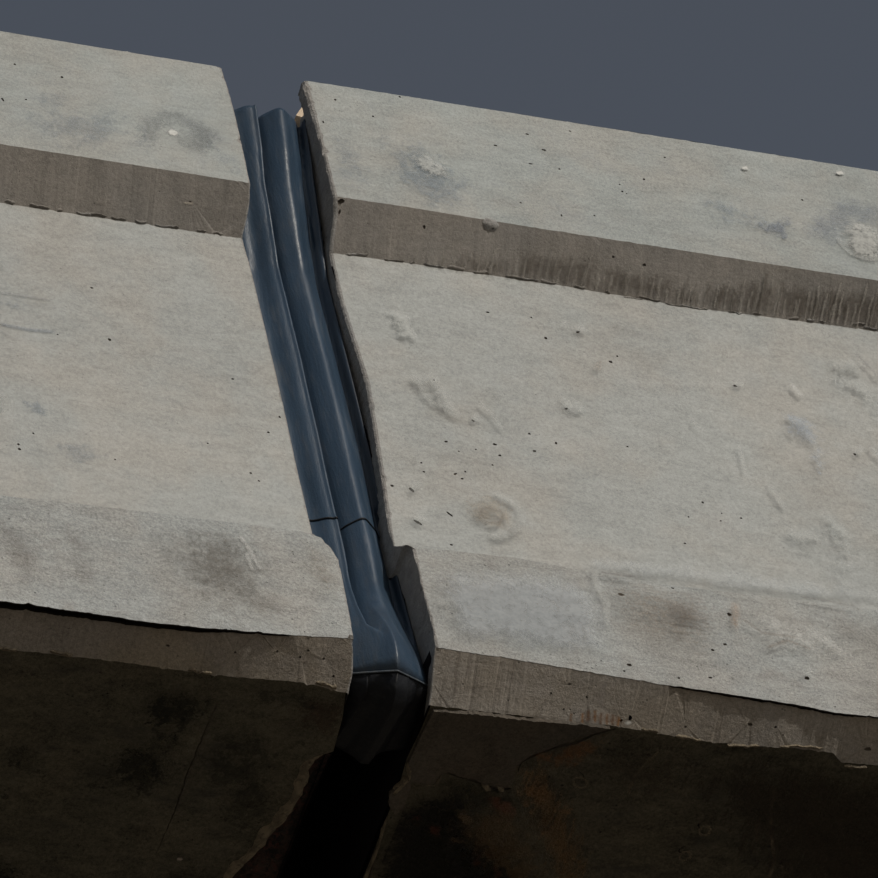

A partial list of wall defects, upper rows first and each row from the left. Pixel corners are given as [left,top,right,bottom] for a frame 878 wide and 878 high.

spalling [223,753,331,878]
peeling [365,708,632,878]
crack [447,729,615,791]